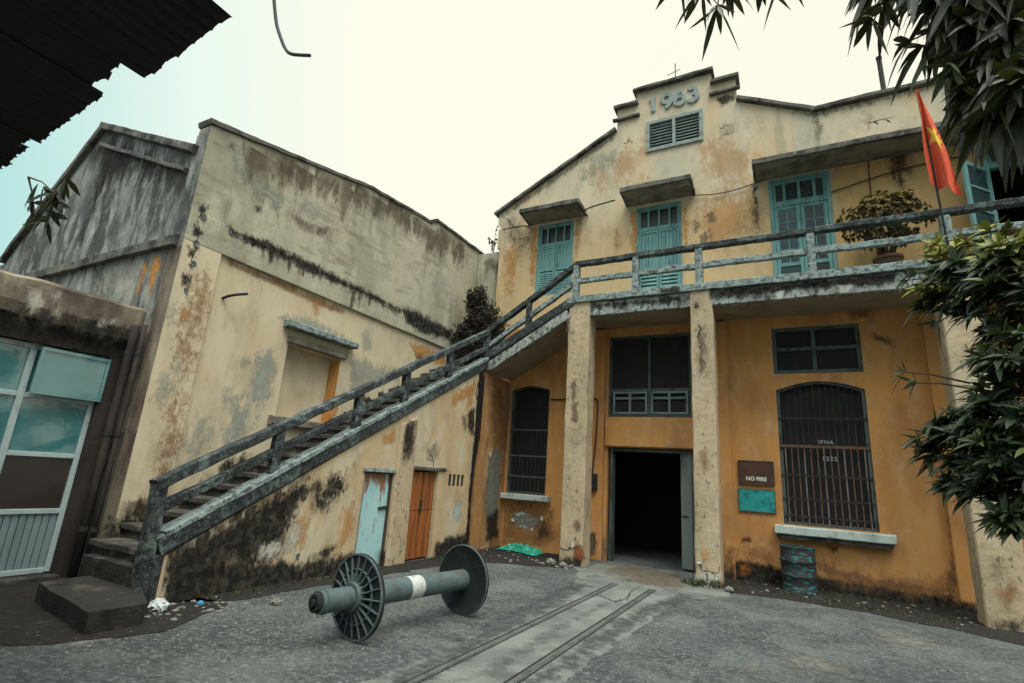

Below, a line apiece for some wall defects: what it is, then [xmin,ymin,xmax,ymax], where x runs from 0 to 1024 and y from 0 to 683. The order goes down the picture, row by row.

water stain [79,138,179,241]
water stain [231,145,464,264]
rust [137,256,162,294]
mould [229,225,454,341]
crack [697,324,706,374]
mould [219,453,246,483]
flaking render [484,447,501,540]
mould [162,473,352,602]
mould [434,533,469,557]
flaking render [511,511,544,531]
water stain [723,538,782,585]
water stain [817,564,977,613]